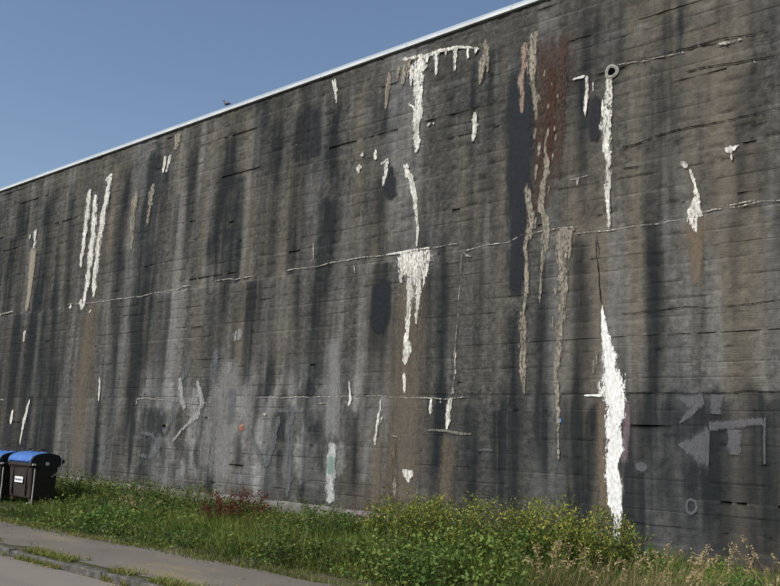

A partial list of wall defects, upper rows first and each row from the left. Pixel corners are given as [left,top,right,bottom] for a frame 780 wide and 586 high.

corrosion [532,29,574,213]
crack [708,200,780,211]
crack [287,243,384,275]
water stain [503,31,574,459]
crack [432,220,674,306]
crack [68,285,191,305]
crack [622,299,780,314]
crack [256,321,462,416]
peeling [584,305,627,539]
crack [625,388,780,396]
peeling [324,442,337,504]